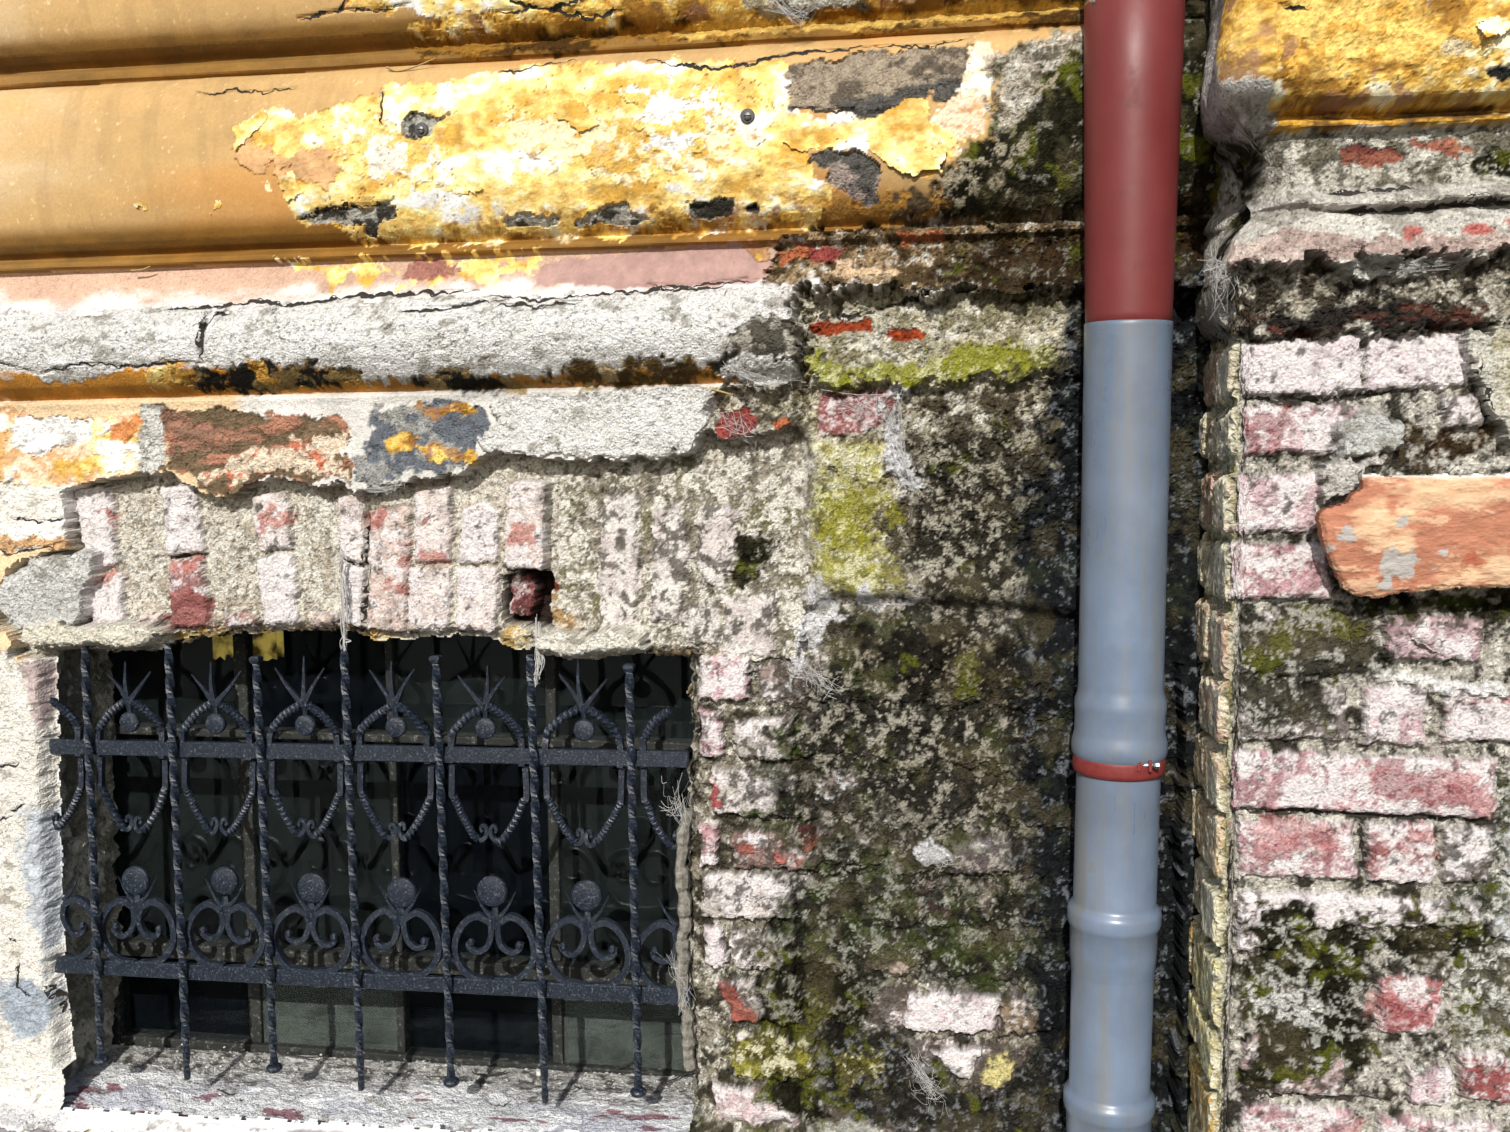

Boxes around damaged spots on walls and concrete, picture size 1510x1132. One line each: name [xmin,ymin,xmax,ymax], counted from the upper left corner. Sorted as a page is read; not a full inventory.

crack [501,59,572,74]
crack [497,0,617,21]
peeling [348,0,918,42]
crack [647,39,963,71]
peeling [1200,0,1510,170]
flaking render [1175,189,1211,284]
crack [0,277,748,373]
peeling [0,41,1085,1132]
damp [785,577,925,694]
damp [1150,130,1283,1132]
damp [1000,278,1085,1132]
damp [913,836,954,867]